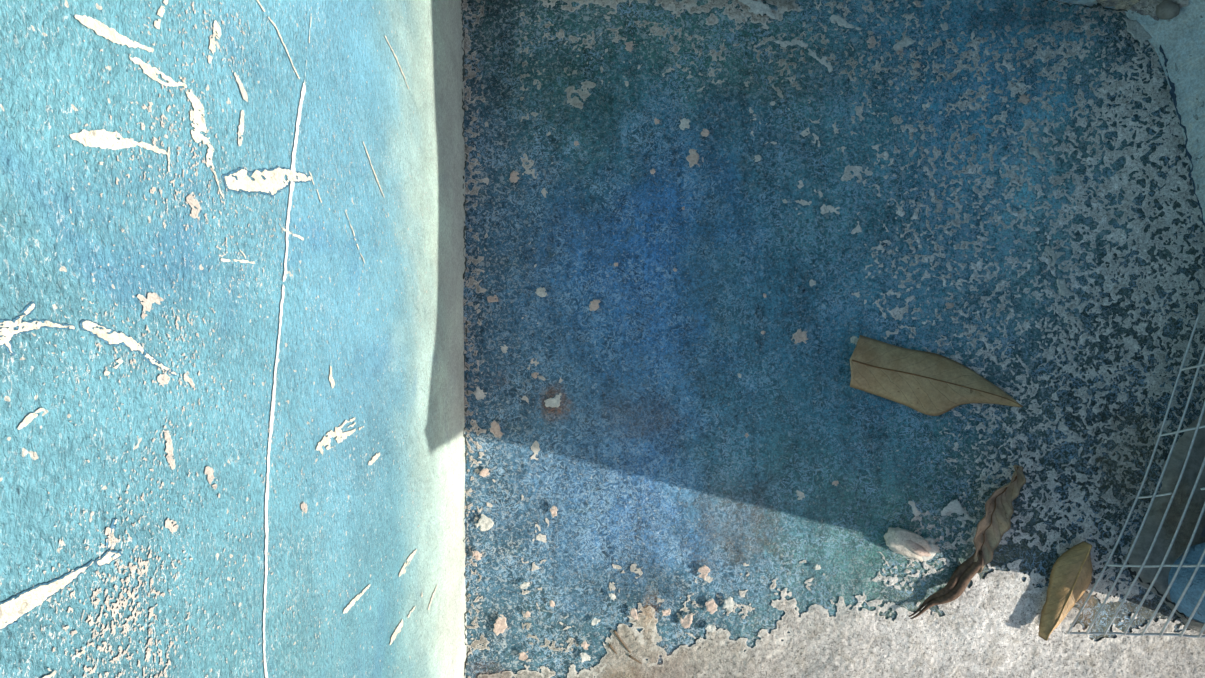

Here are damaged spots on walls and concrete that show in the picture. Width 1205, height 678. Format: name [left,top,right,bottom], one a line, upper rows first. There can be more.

peeling [461,0,1205,678]